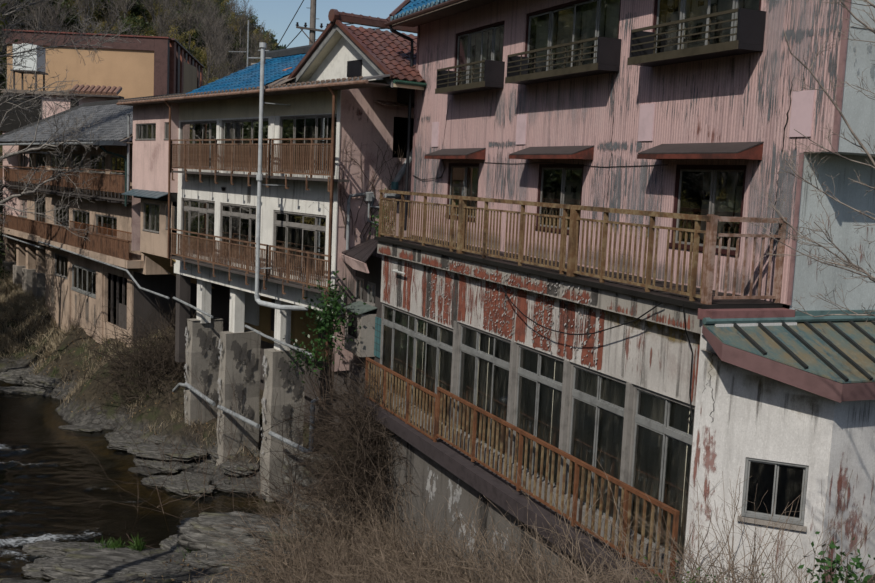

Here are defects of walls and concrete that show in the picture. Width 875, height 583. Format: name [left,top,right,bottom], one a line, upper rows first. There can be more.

crack [767,49,806,258]
peeling [378,246,637,370]
water stain [197,328,256,434]
water stain [425,468,508,553]
corrosion [693,428,717,518]
corrosion [823,462,874,583]